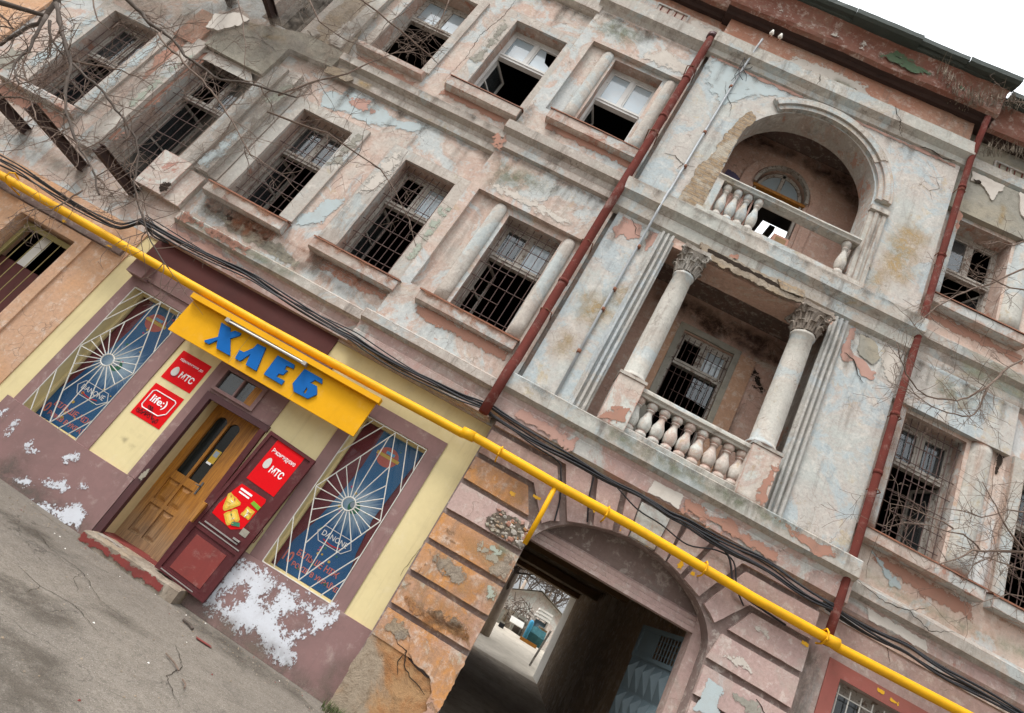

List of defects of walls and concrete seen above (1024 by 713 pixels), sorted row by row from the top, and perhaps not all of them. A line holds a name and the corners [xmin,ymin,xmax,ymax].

flaking render [320,66,428,166]
flaking render [678,56,806,206]
flaking render [970,171,1005,201]
flaking render [613,215,658,251]
flaking render [840,328,904,386]
peeling [62,451,80,464]
peeling [515,408,579,452]
flaking render [477,508,529,601]
peeling [648,481,779,561]
peeling [774,517,840,557]
peeling [202,558,340,669]
crack [396,639,425,695]